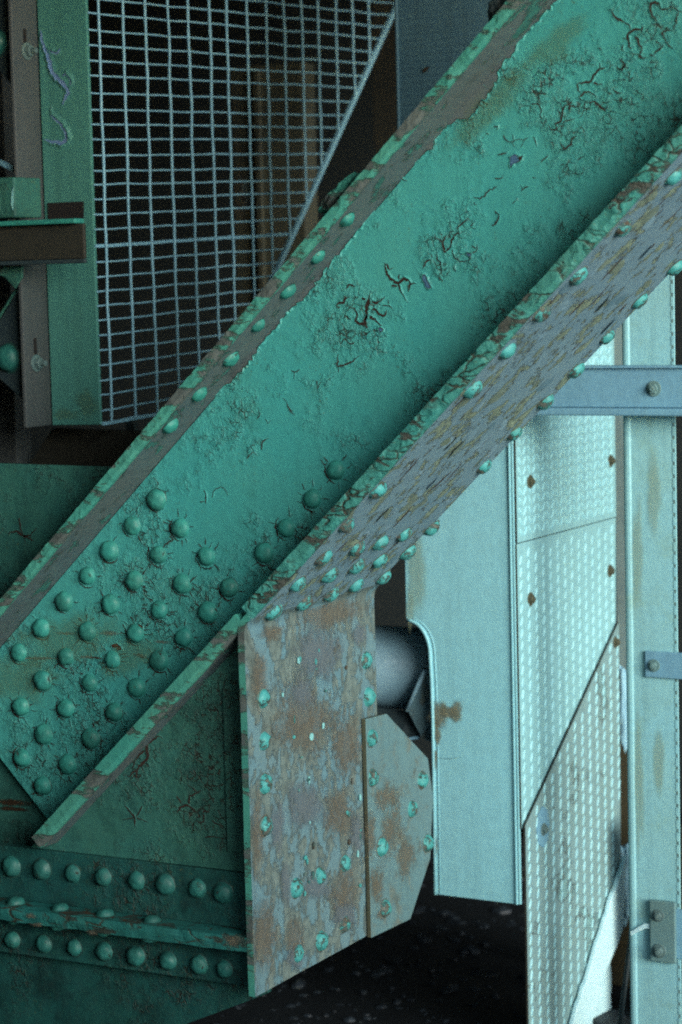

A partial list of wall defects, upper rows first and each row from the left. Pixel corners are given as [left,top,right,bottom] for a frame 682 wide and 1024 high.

peeling [416,0,561,162]
peeling [508,152,524,169]
crack [246,0,682,459]
peeling [215,208,377,397]
peeling [547,255,627,335]
peeling [332,358,557,586]
rust [275,694,326,747]
rust [434,702,462,767]
rust [367,784,413,874]